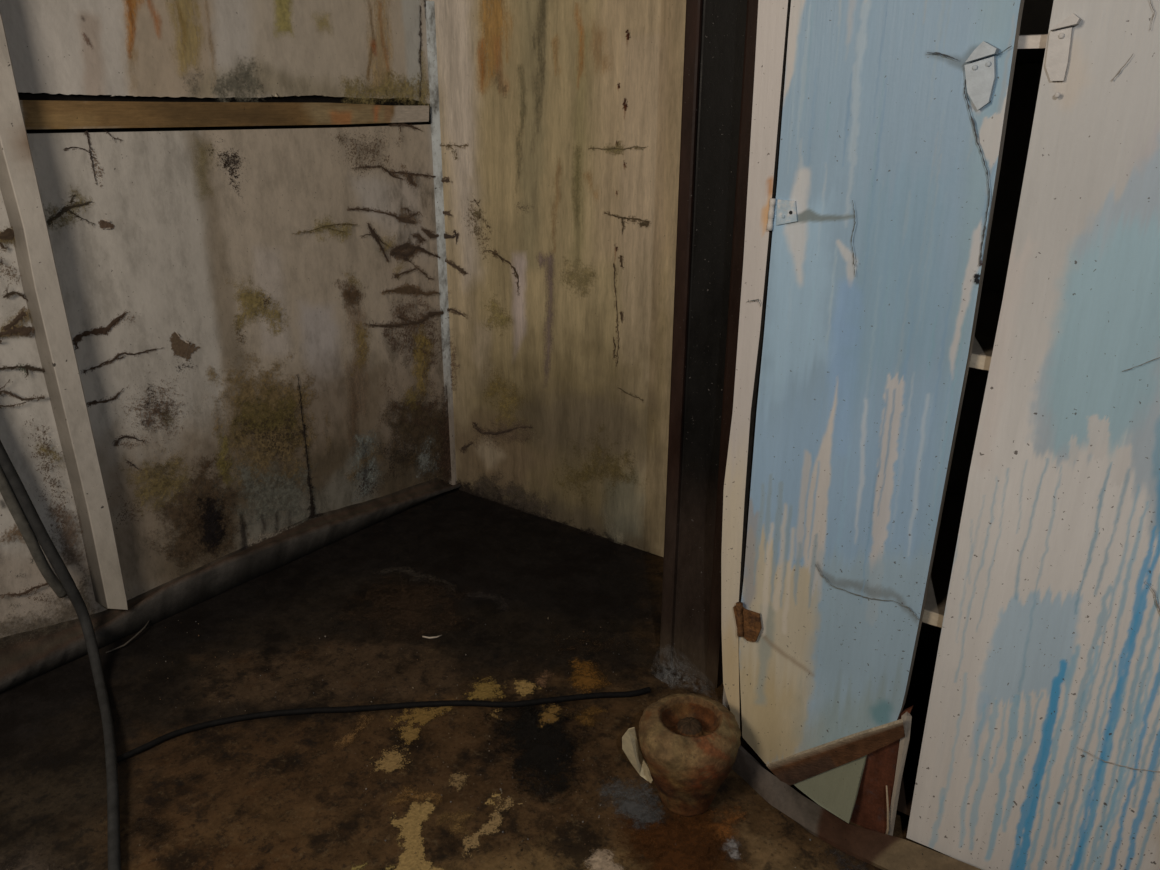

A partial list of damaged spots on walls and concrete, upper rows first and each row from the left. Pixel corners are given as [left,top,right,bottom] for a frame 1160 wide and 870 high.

crack [45,131,121,228]
crack [293,122,520,294]
crack [0,227,45,409]
crack [72,311,164,407]
crack [365,307,468,335]
damp [538,254,596,373]
crack [112,434,152,471]
damp [108,283,328,570]
crack [296,375,323,519]